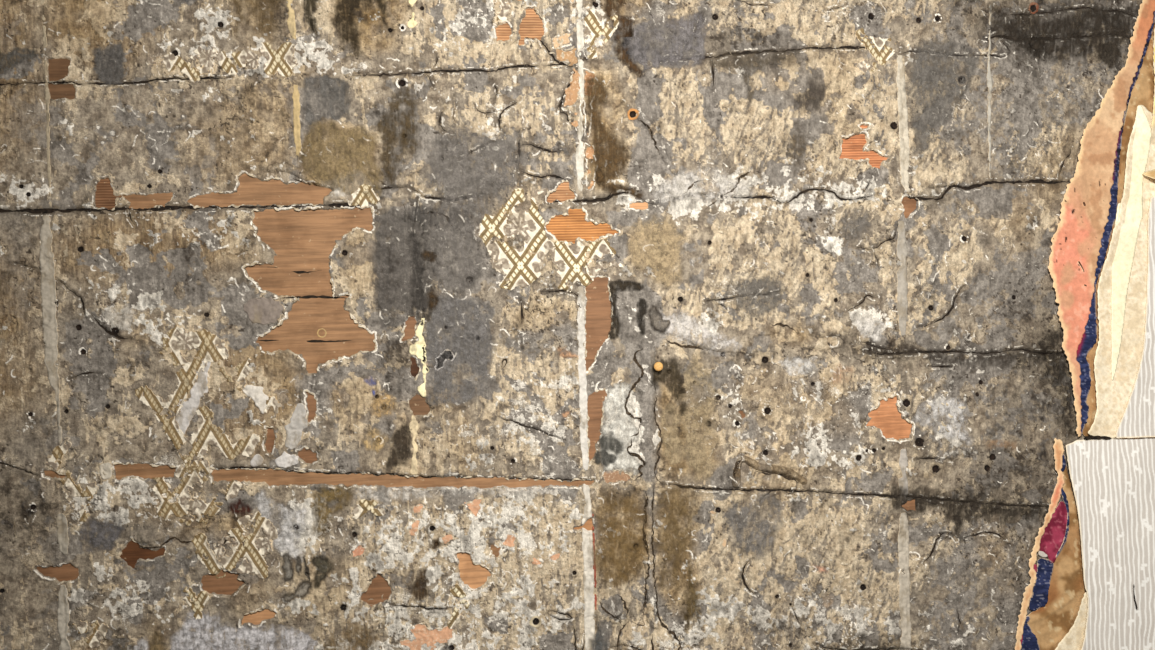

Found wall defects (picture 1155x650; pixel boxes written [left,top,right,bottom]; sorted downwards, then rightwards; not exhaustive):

crack [900,7,1136,57]
peeling [95,178,173,210]
crack [0,187,486,227]
crack [907,148,1071,201]
peeling [187,172,633,536]
peeling [175,361,211,434]
crack [666,484,1044,561]
crack [818,642,912,650]